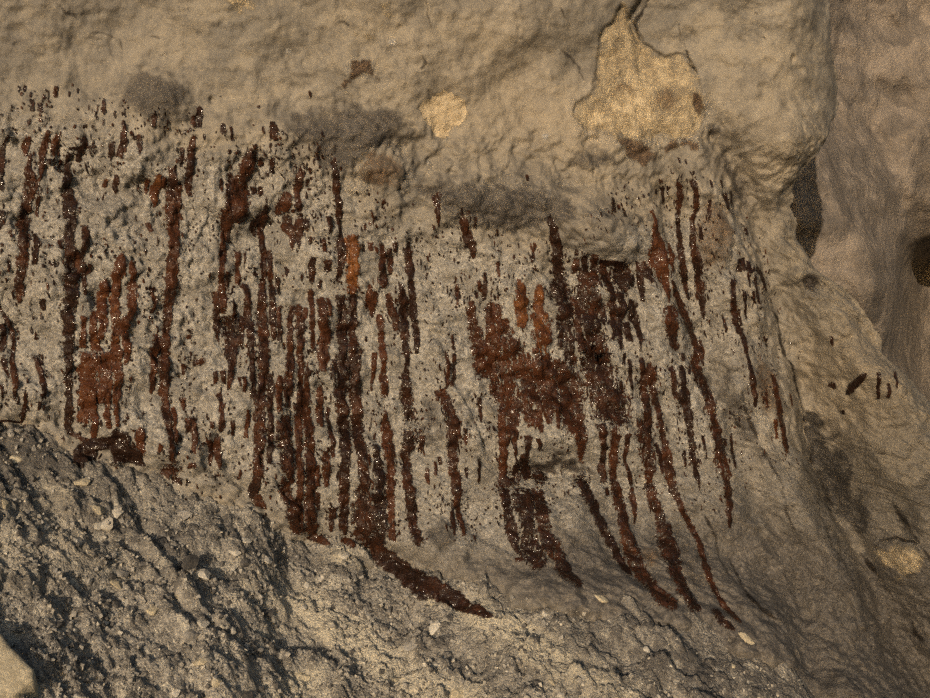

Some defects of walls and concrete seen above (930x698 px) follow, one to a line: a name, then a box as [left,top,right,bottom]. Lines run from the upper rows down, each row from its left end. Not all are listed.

water stain [120,73,188,120]
water stain [287,106,413,172]
spalling [419,90,468,139]
spalling [575,5,703,140]
water stain [416,181,575,234]
rust [0,83,803,631]
rust [828,371,898,399]